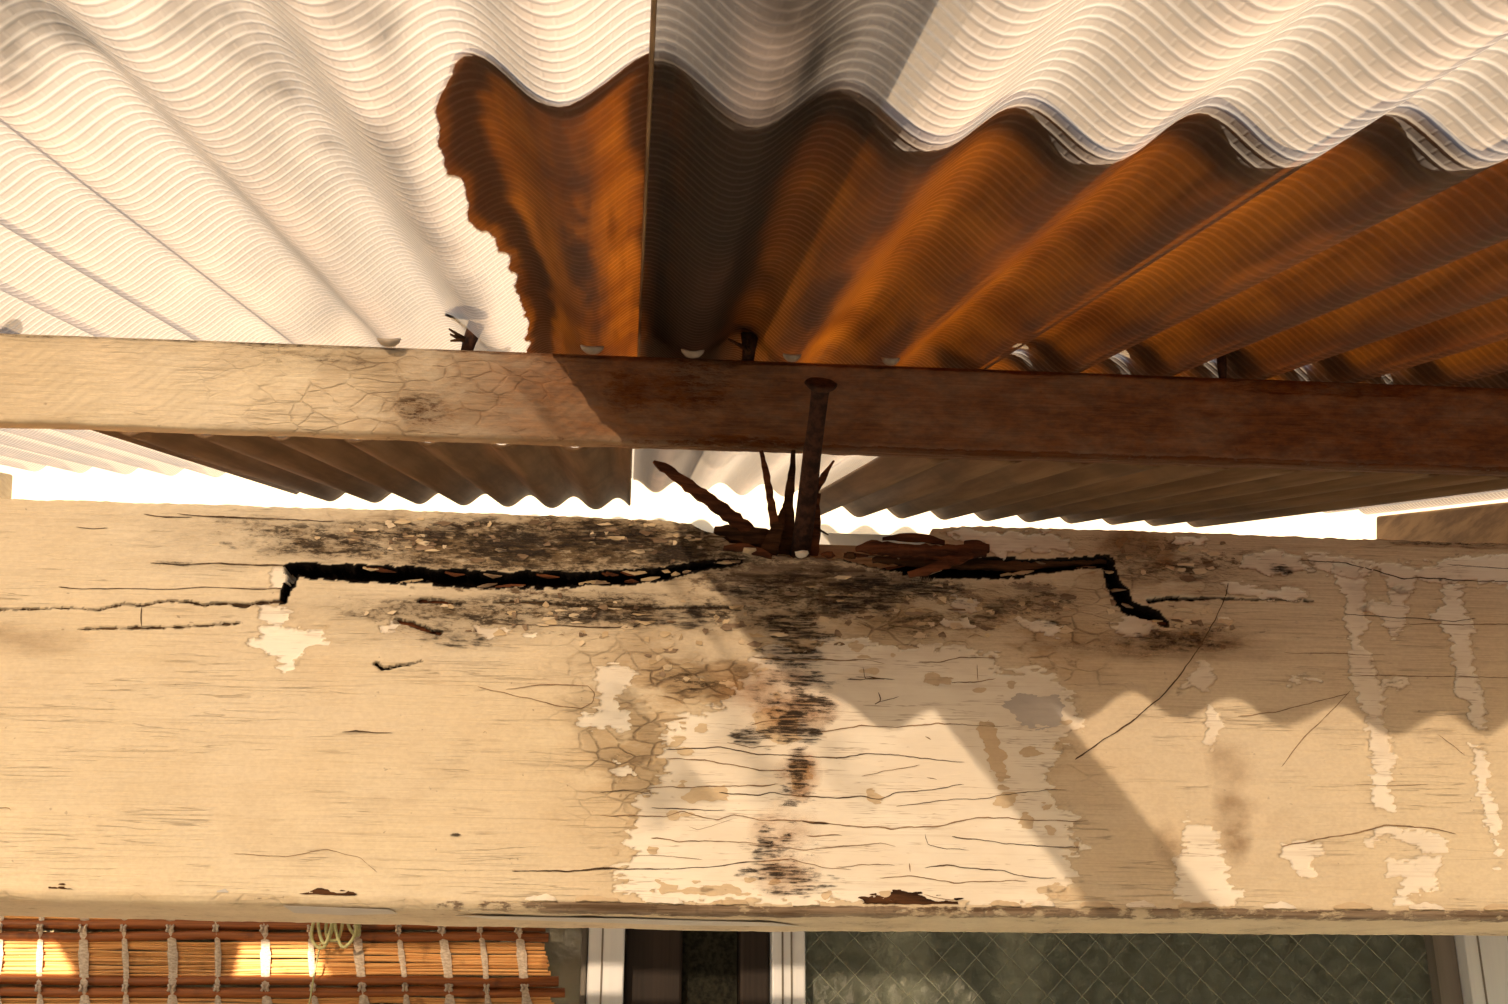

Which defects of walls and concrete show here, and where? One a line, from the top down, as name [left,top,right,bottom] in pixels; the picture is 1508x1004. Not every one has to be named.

crack [145,513,331,522]
water stain [347,524,707,565]
water stain [1112,532,1170,562]
crack [0,535,740,630]
peeling [246,566,330,673]
peeling [364,611,441,635]
spalling [418,599,454,609]
water stain [420,635,497,647]
water stain [566,574,969,897]
peeling [456,575,1156,926]
peeling [1107,536,1508,910]